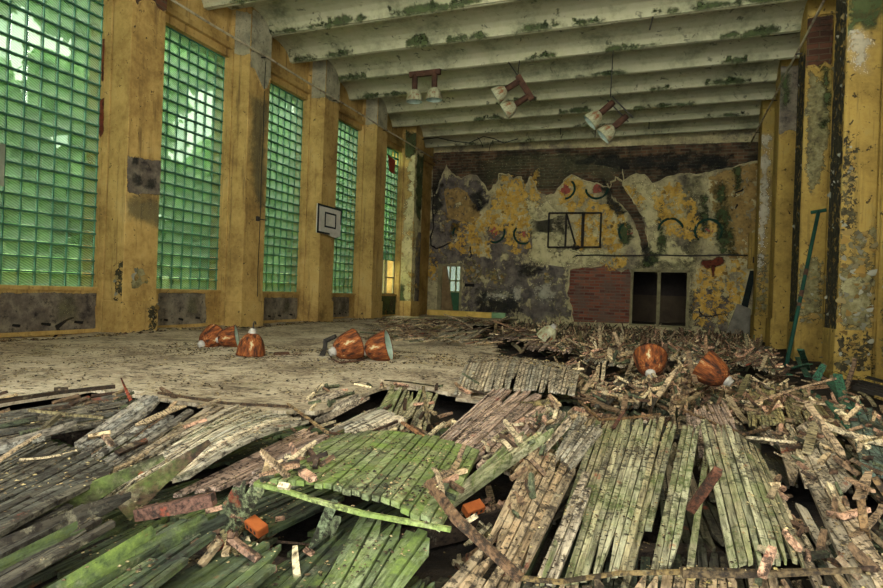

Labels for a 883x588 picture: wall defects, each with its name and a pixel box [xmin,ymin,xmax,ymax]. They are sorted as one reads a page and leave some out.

spalling [234,10,272,92]
spalling [311,60,340,103]
damp [429,174,573,324]
spalling [381,0,883,373]